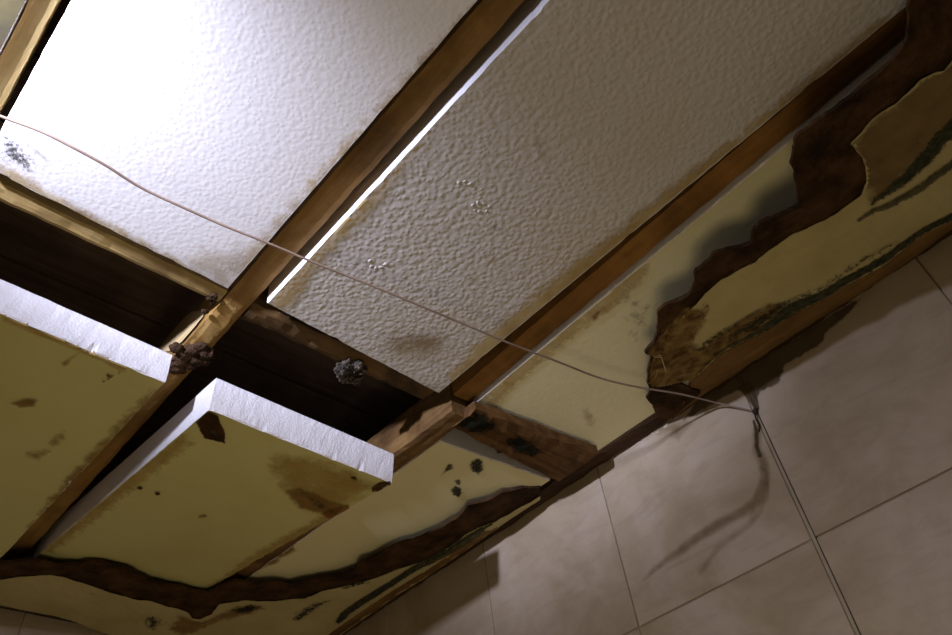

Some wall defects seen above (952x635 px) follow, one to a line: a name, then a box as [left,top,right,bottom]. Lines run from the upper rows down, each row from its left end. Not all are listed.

water stain [0,137,151,249]
water stain [448,20,887,381]
water stain [857,66,952,222]
water stain [685,301,857,457]
water stain [648,214,952,389]
water stain [222,460,369,580]
water stain [470,459,483,473]